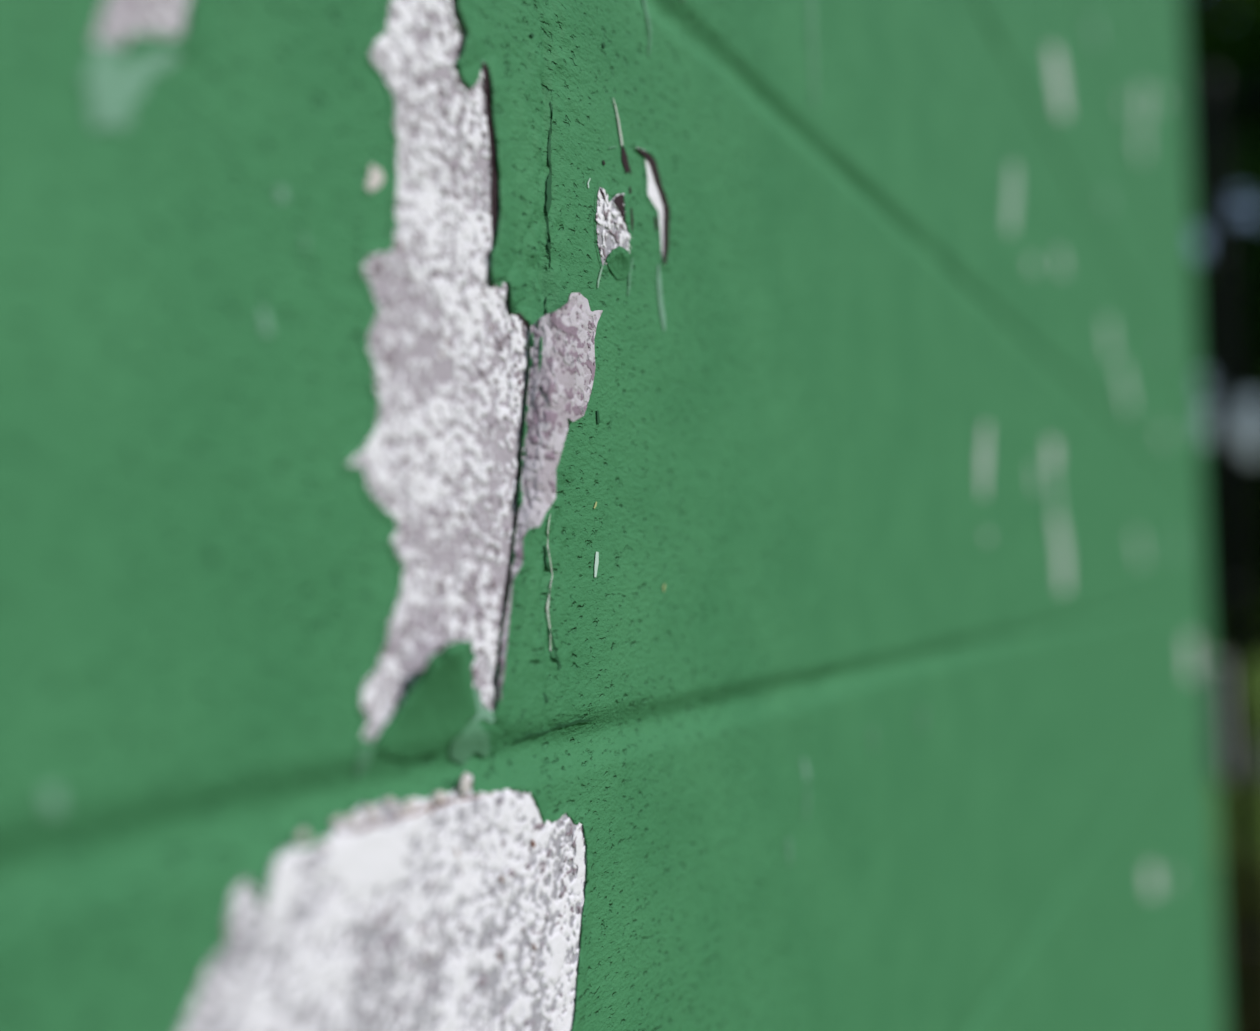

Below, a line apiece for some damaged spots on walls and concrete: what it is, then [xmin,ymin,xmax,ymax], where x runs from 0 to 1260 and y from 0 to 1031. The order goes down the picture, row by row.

peeling [87,0,217,63]
peeling [593,141,675,274]
peeling [339,0,603,757]
peeling [172,758,597,1031]